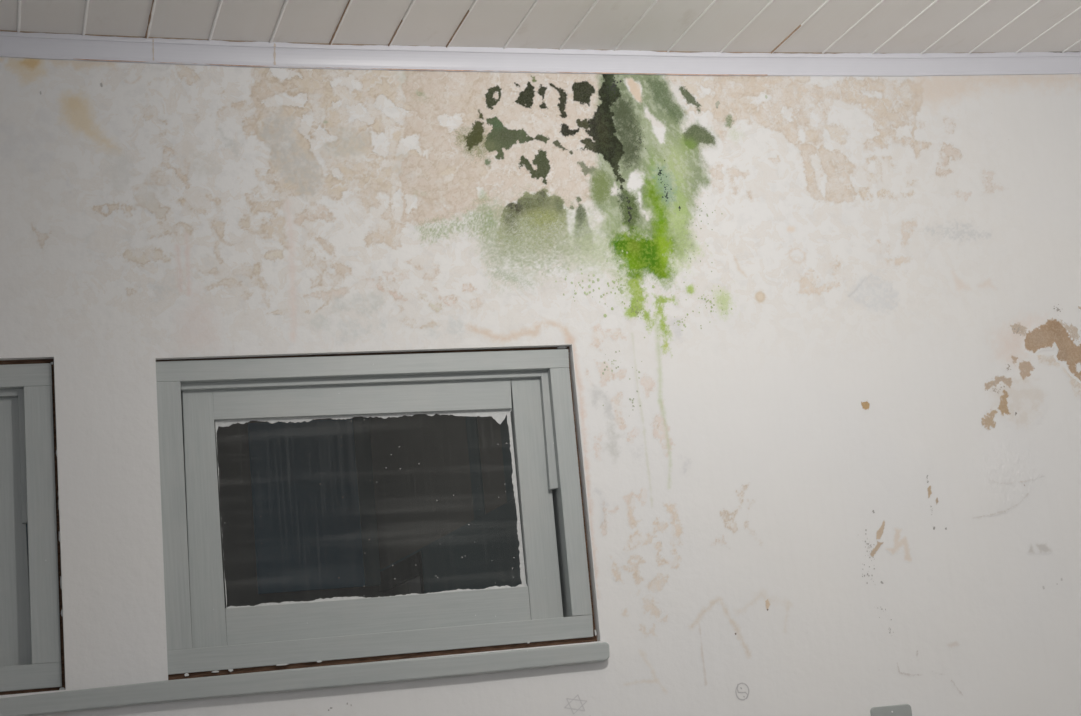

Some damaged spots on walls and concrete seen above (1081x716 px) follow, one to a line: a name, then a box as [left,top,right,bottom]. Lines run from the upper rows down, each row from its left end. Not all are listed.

peeling [246,67,596,229]
water stain [408,73,643,302]
mould [678,85,749,151]
peeling [670,75,964,206]
peeling [76,192,272,356]
spalling [981,304,1081,434]